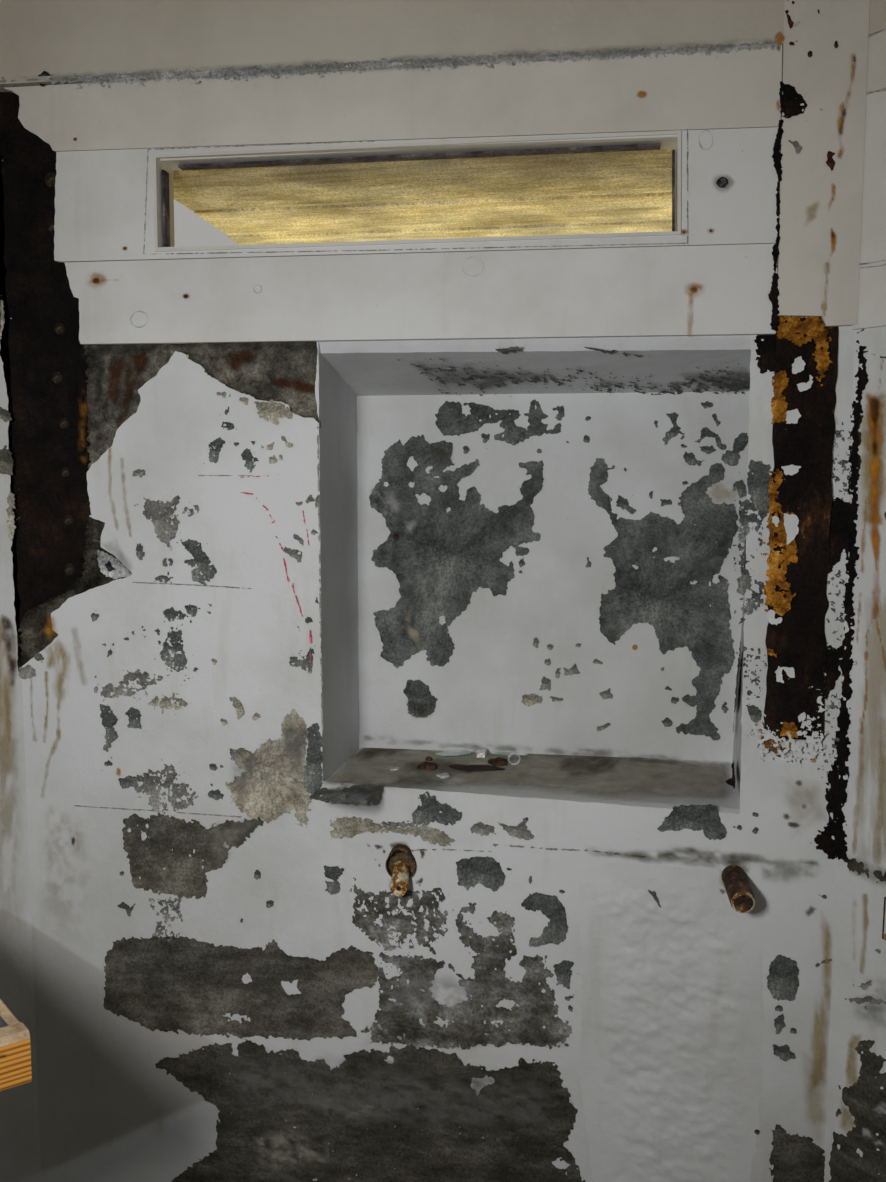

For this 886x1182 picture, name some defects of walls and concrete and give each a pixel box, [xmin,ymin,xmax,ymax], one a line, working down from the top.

rust [826,150,842,171]
spalling [0,160,132,679]
peeling [134,494,217,585]
spalling [83,342,321,473]
peeling [369,334,869,861]
rust [765,370,789,430]
rust [761,469,804,616]
rust [776,304,833,386]
rust [862,396,883,571]
peeling [94,597,585,1182]
peeling [767,954,799,1062]
peeling [754,1040,886,1182]